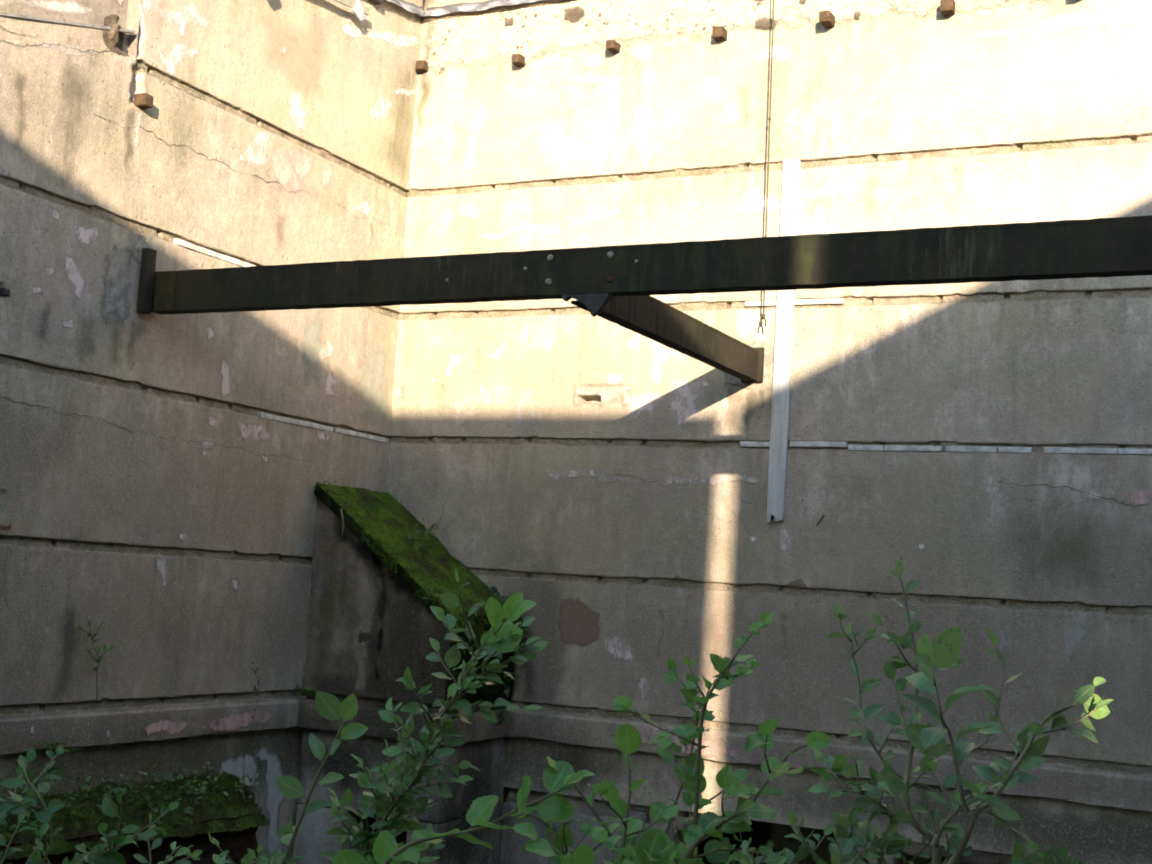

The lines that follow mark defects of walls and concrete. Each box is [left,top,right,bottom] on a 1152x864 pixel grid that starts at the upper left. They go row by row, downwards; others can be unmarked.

spalling [955,0,1050,12]
spalling [342,0,941,92]
crack [95,114,418,248]
peeling [240,131,333,190]
peeling [71,226,99,244]
peeling [45,256,85,299]
crack [982,476,1150,507]